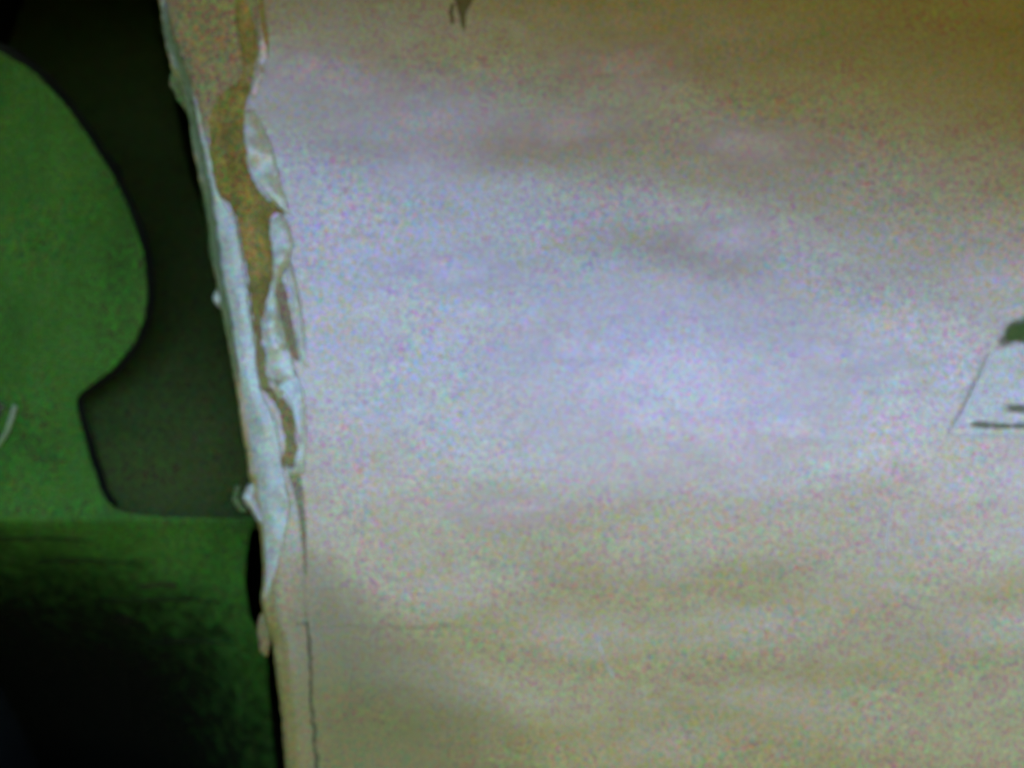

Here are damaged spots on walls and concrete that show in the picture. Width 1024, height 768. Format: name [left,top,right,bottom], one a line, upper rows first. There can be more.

peeling [169,0,307,596]
spalling [257,613,271,656]
crack [306,621,319,768]